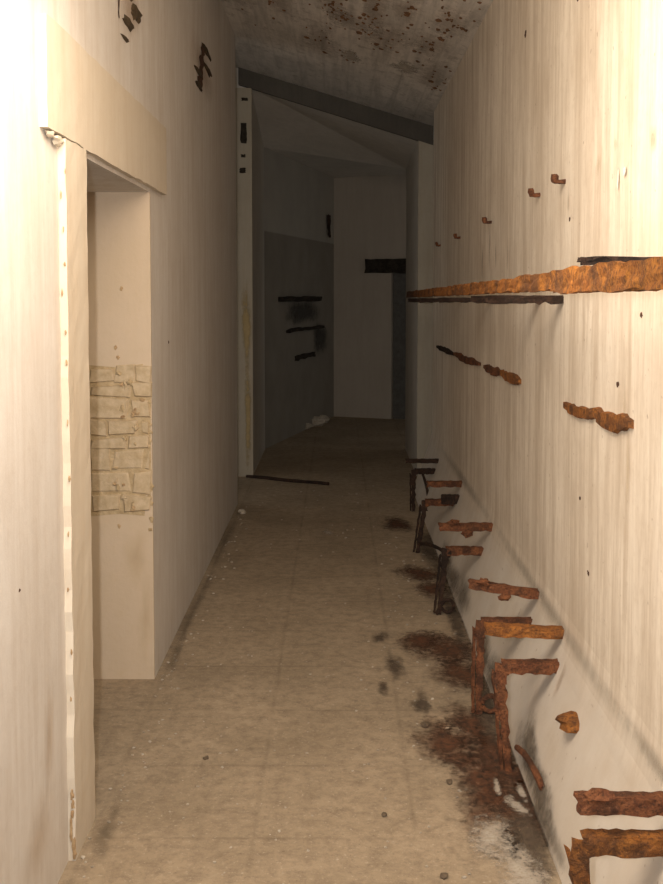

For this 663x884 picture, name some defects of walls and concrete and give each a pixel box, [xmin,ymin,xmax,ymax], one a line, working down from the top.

rust [400,631,485,688]
rust [413,705,548,843]